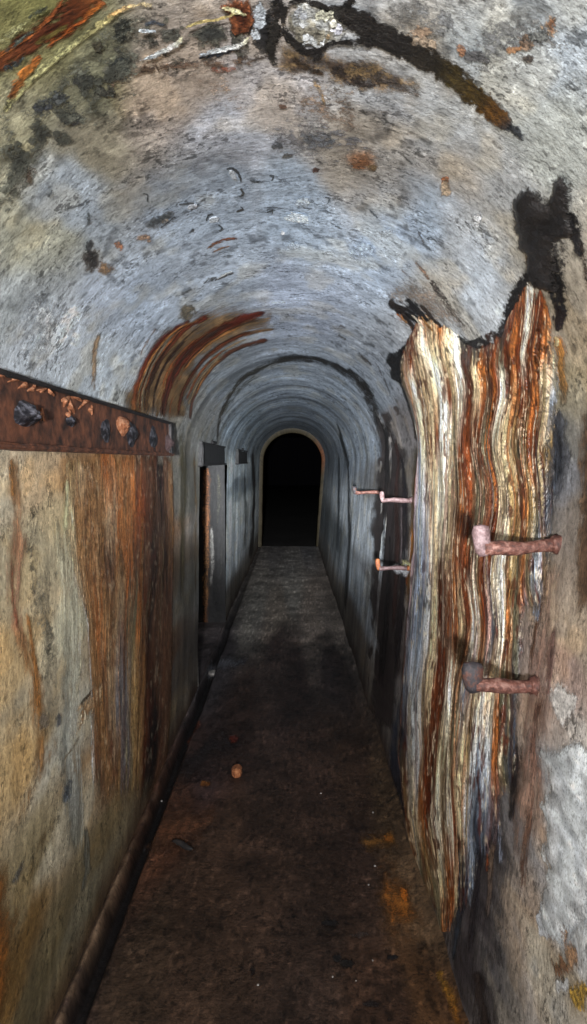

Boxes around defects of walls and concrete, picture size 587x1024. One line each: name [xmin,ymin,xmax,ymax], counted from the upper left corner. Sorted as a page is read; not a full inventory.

rust [0,0,106,100]
spalling [287,2,348,48]
damp [385,0,467,53]
damp [472,3,565,73]
damp [0,1,420,214]
rust [0,334,100,417]
rust [125,306,275,419]
damp [388,298,442,331]
damp [430,176,587,530]
rust [7,459,56,773]
rust [68,454,174,814]
rust [359,262,560,934]